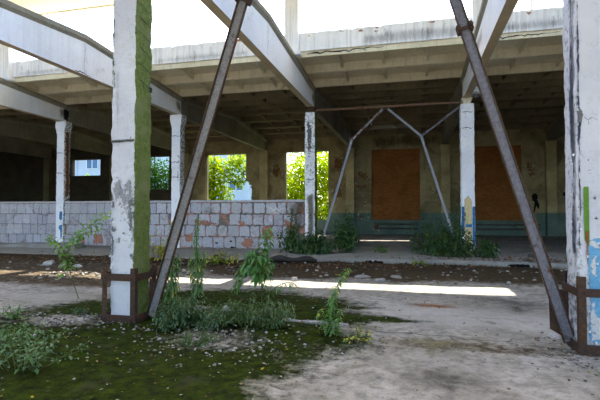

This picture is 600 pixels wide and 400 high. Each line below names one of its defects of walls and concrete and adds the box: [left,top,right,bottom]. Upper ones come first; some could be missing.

crack [307,46,384,55]
peeling [111,177,135,234]
peeling [588,297,600,345]